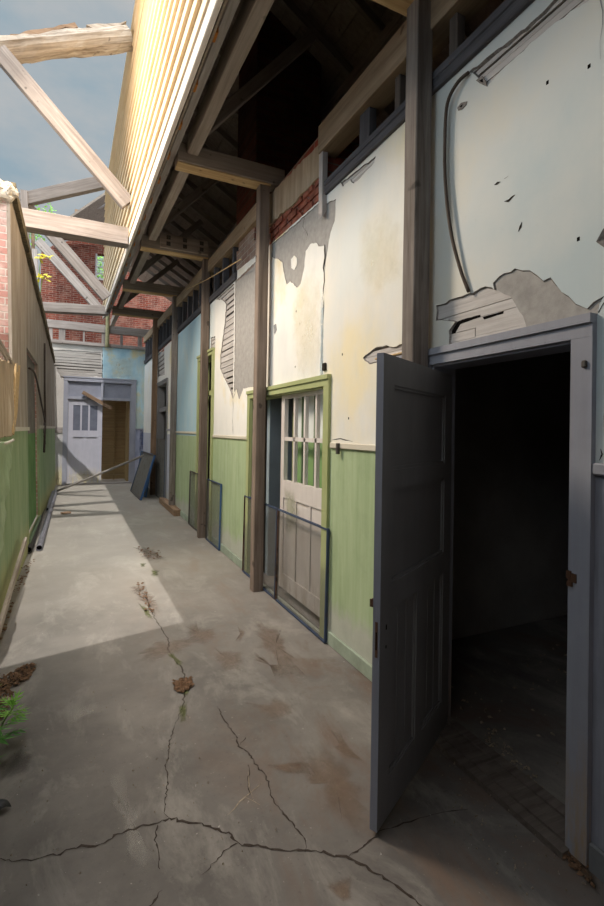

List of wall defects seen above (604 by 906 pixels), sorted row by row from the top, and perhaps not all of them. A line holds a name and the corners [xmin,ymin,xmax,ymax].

spalling [469,0,589,86]
flaking render [269,179,336,287]
spalling [436,269,603,344]
crack [0,589,467,906]